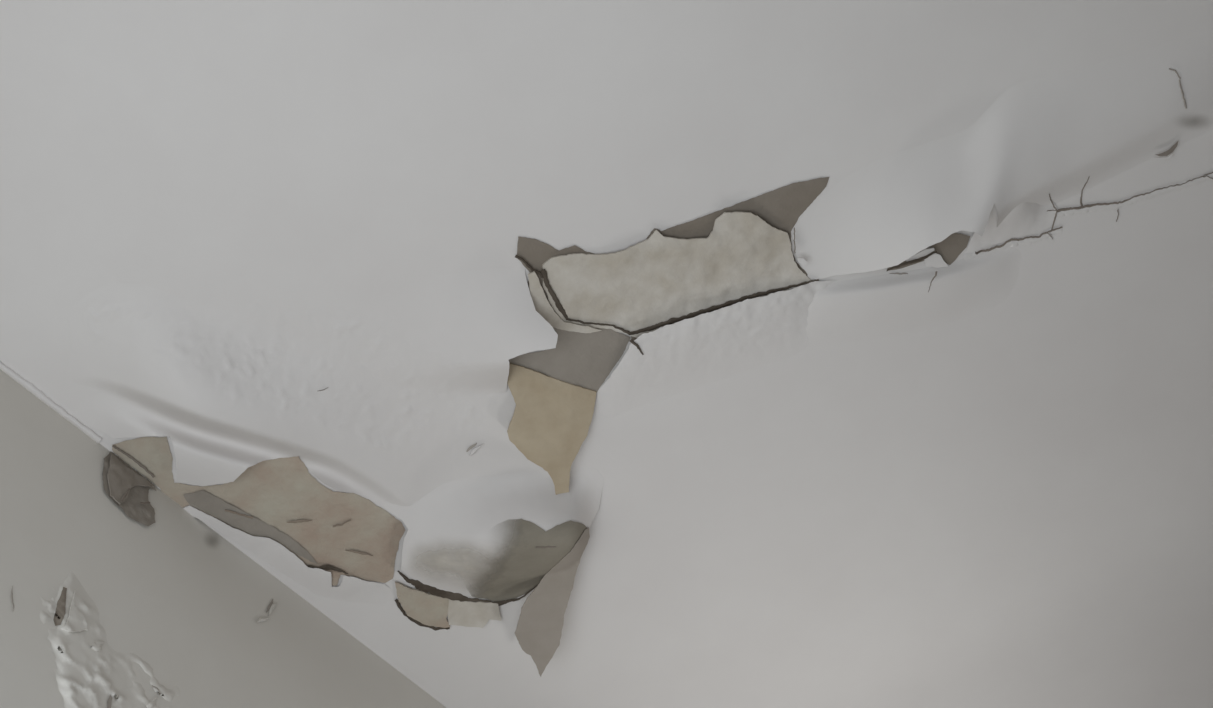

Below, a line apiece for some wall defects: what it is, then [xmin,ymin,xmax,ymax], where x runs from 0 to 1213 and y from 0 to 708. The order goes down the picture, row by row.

crack [1169,68,1187,109]
peeling [507,177,837,495]
crack [805,172,1213,346]
peeling [102,437,590,677]